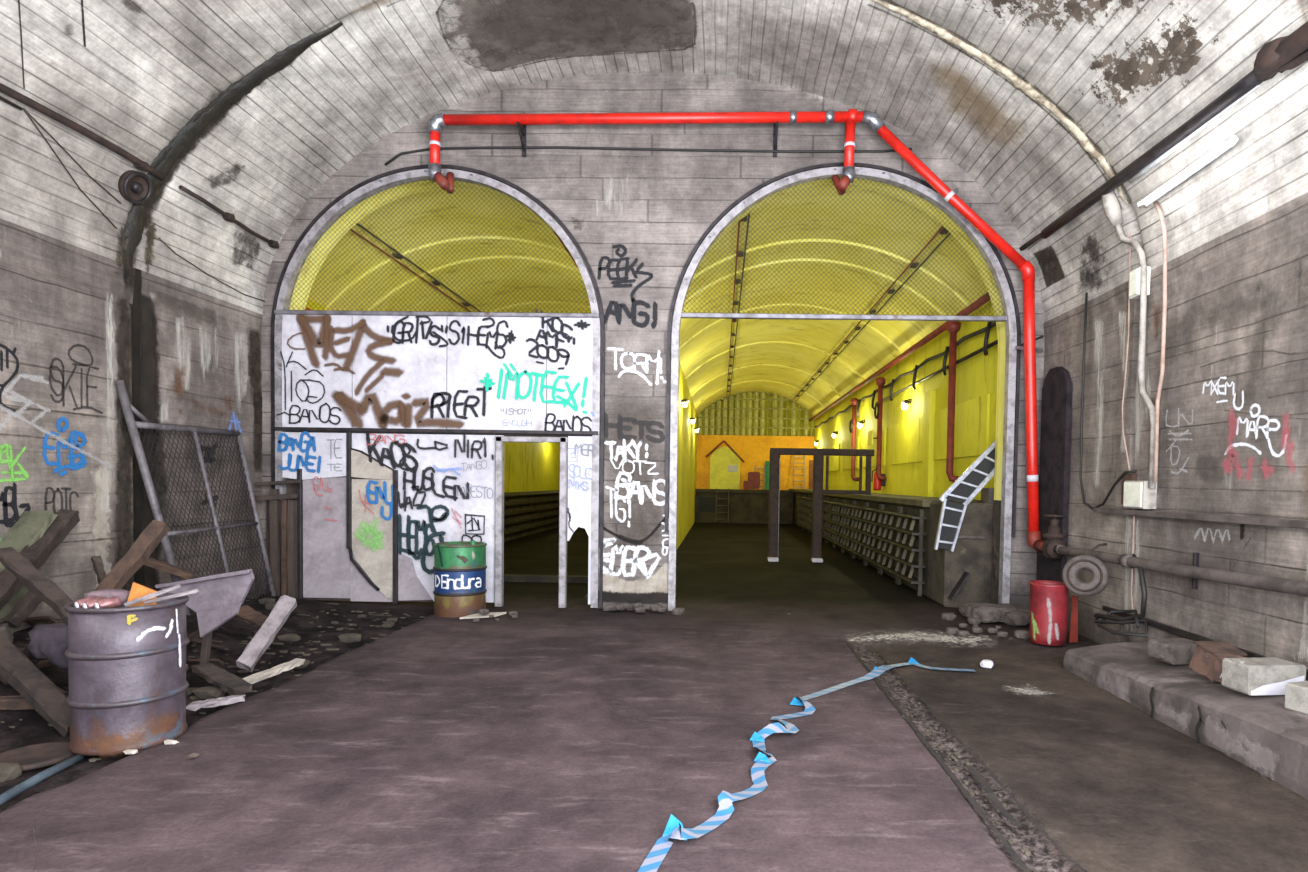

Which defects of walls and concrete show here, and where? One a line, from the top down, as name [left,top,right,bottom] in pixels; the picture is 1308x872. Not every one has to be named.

spalling [436,0,697,72]
peeling [965,0,1219,126]